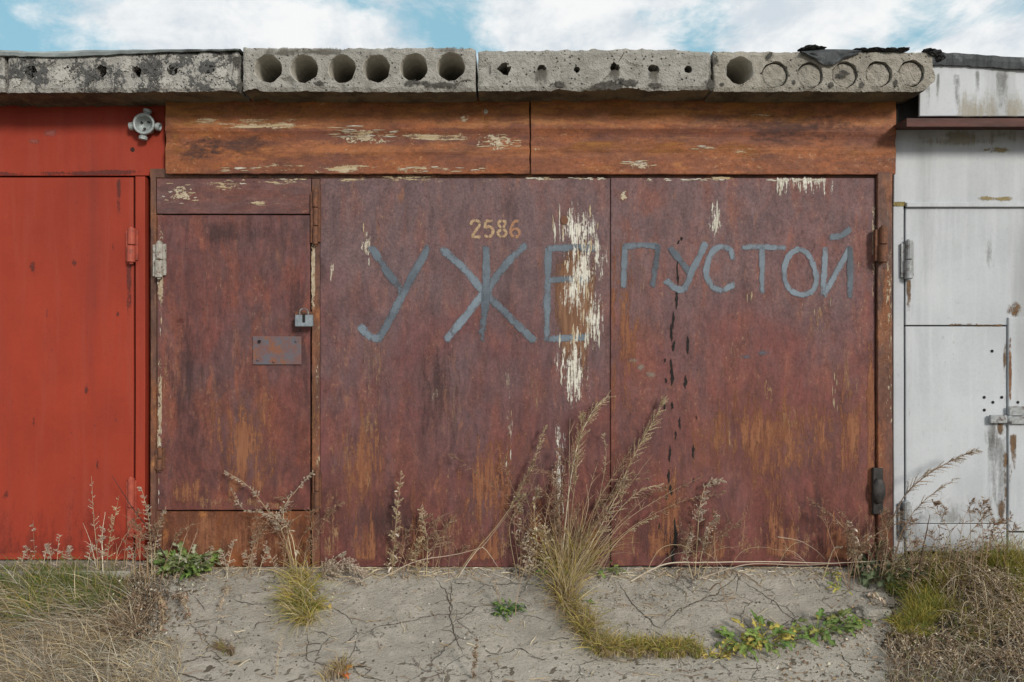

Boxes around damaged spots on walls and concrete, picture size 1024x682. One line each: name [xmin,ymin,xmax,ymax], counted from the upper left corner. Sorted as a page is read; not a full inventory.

peeling [190,118,306,129]
peeling [210,163,369,190]
peeling [327,115,522,150]
peeling [620,159,730,181]
peeling [767,177,833,196]
peeling [552,204,609,402]
corrosion [1003,338,1012,400]
corrosion [173,384,296,564]
corrosion [330,408,426,561]
corrosion [444,432,520,561]
corrosion [647,341,892,559]
corrosion [997,423,1016,524]